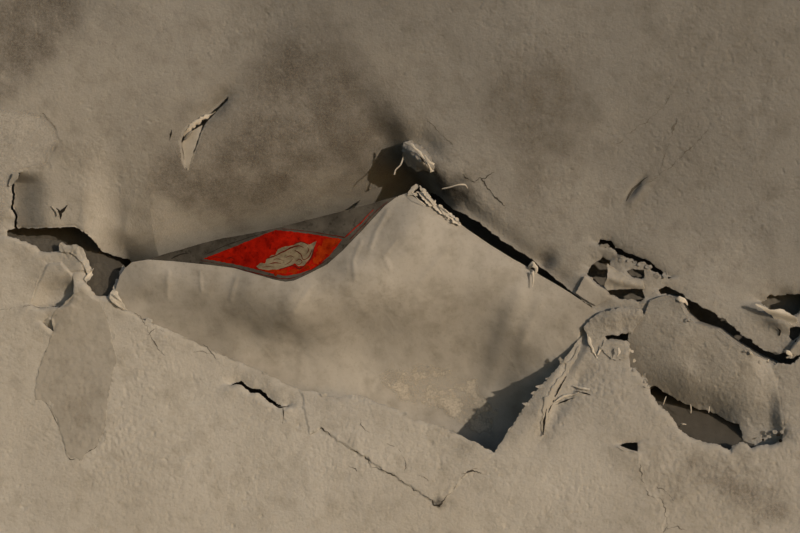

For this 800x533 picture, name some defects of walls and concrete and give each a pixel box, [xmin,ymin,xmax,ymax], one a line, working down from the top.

peeling [7,168,131,461]
spalling [576,257,645,305]
spalling [659,286,686,299]
spalling [755,294,800,355]
crack [232,381,287,424]
spalling [650,386,785,450]
crack [313,427,480,507]